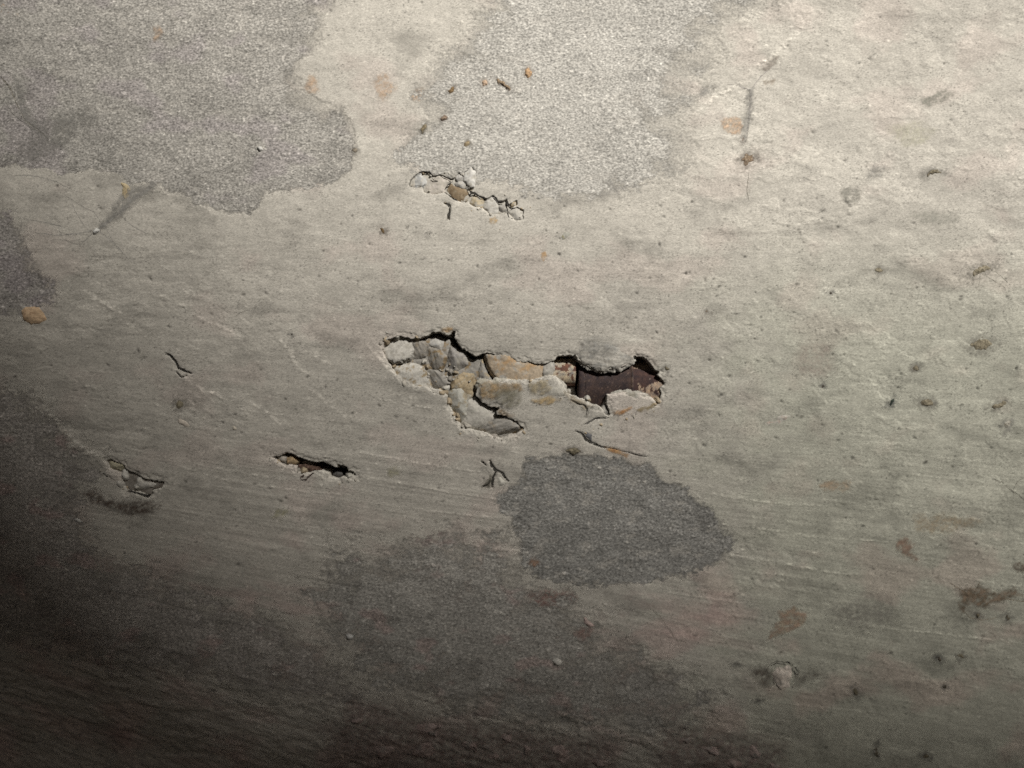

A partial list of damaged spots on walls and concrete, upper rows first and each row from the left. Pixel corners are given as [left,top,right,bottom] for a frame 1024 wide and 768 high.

peeling [393,0,756,230]
spalling [378,331,667,441]
crack [574,401,647,457]
spalling [99,460,164,502]
spalling [269,453,361,485]
crack [482,462,509,487]
peeling [299,453,735,737]